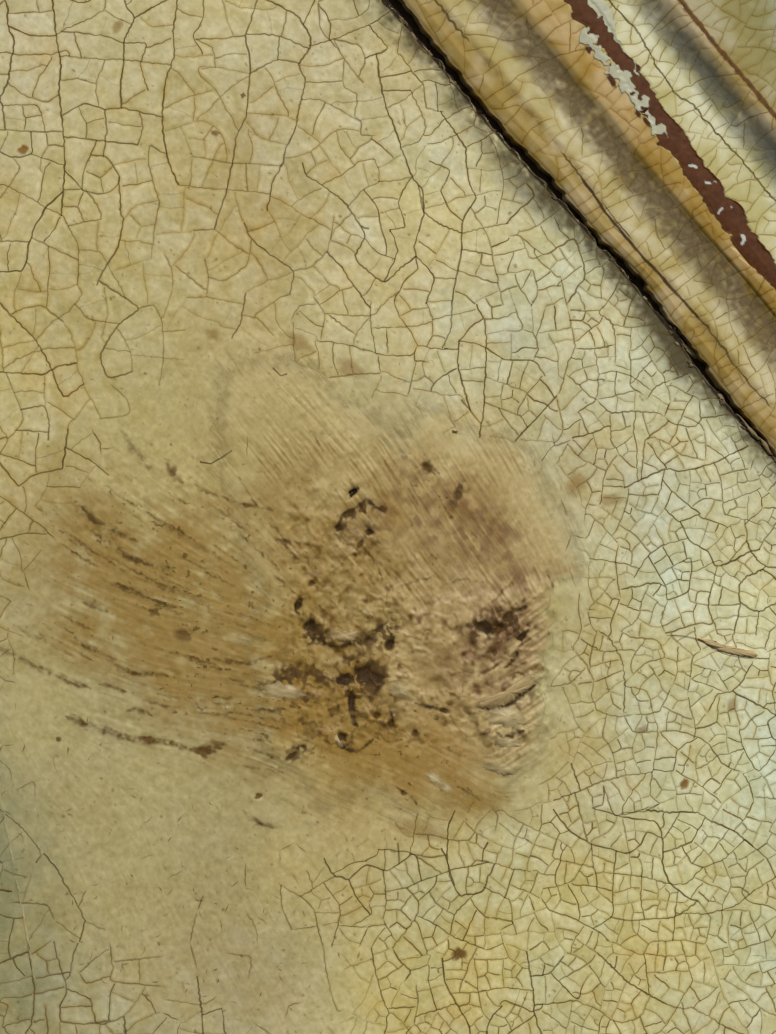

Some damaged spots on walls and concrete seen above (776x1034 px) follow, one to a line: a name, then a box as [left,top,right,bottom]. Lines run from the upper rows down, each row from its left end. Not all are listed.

crack [245,0,346,113]
crack [0,0,179,281]
crack [267,107,307,211]
peeling [564,0,776,289]
crack [0,303,120,397]
crack [327,0,776,635]
damp [64,513,485,806]
crack [733,685,776,740]
crack [324,811,513,934]
crack [553,763,775,919]
crack [430,951,583,1034]
crack [596,952,667,1005]